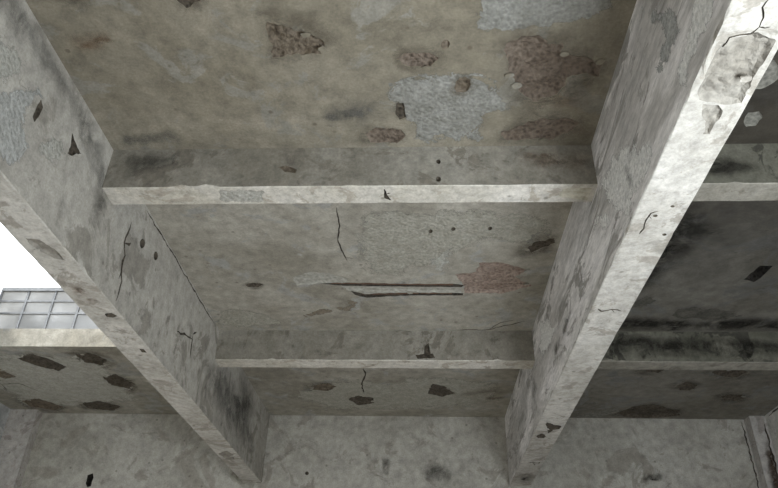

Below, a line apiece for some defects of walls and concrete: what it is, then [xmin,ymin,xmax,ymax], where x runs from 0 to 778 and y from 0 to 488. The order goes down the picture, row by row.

spalling [177,0,200,8]
spalling [266,19,326,58]
peeling [651,0,714,87]
crack [722,0,769,47]
peeling [363,0,612,146]
spalling [697,32,778,134]
crack [336,208,348,260]
crack [116,211,214,323]
spalling [293,262,532,317]